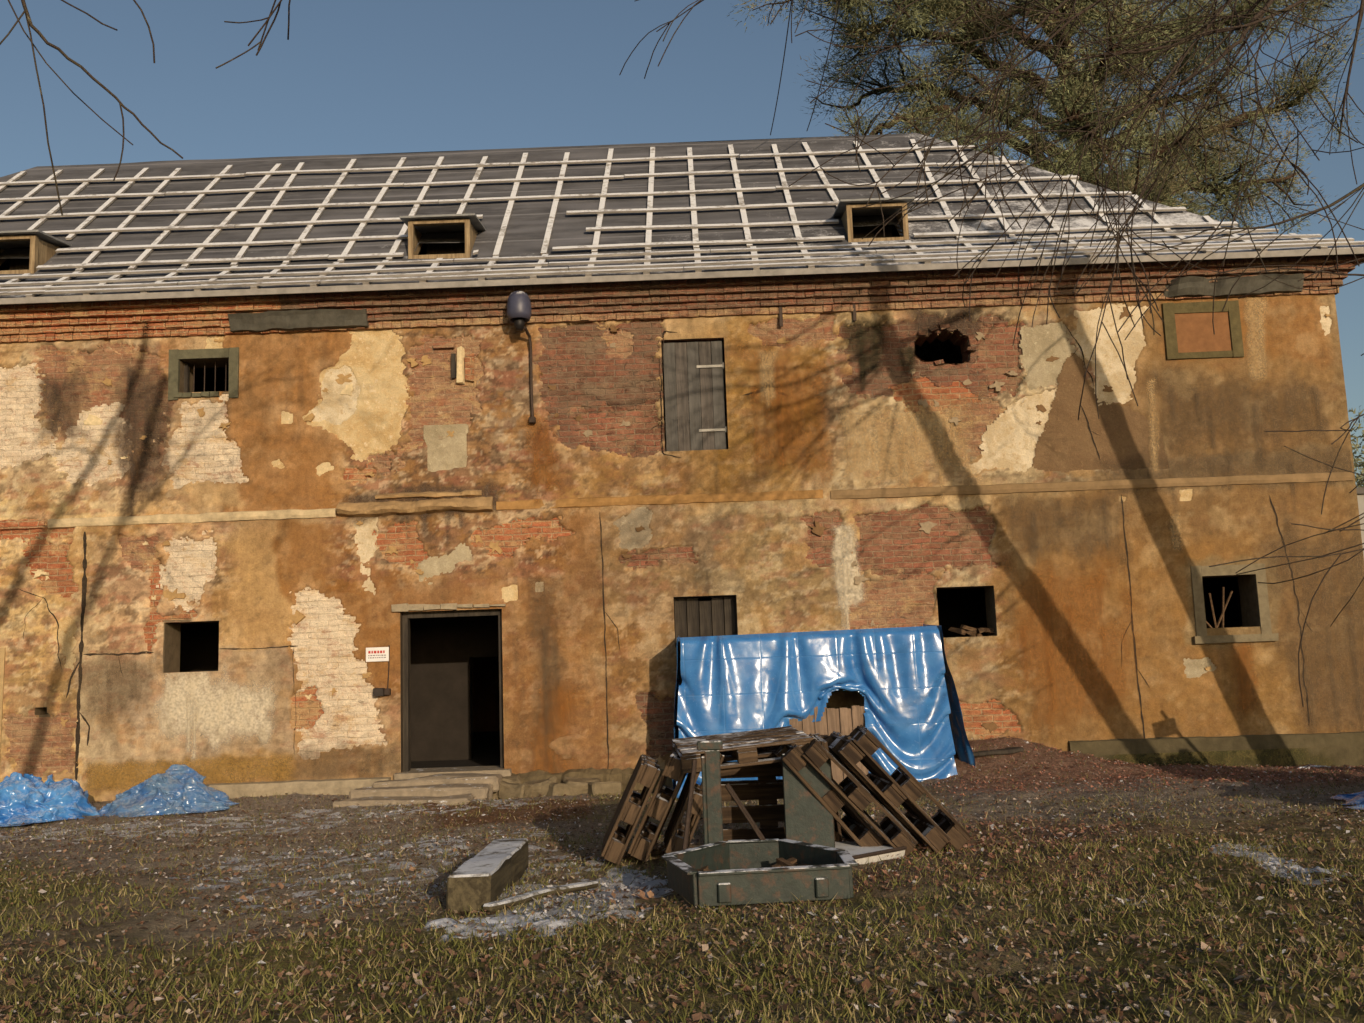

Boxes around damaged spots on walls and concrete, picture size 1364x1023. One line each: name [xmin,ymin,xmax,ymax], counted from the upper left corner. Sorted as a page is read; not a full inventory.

water stain [41,376,76,435]
spalling [0,340,249,489]
water stain [116,369,168,516]
peeling [205,335,224,349]
peeling [281,329,484,486]
spalling [748,302,1149,474]
spalling [117,530,218,654]
peeling [613,507,699,570]
spalling [800,503,1000,630]
spalling [287,587,387,760]
spalling [635,684,681,765]